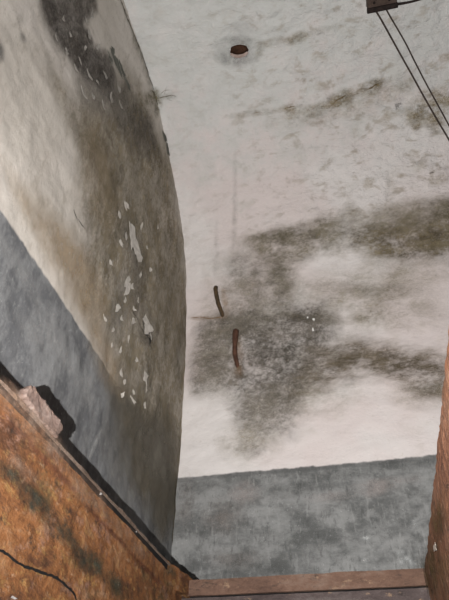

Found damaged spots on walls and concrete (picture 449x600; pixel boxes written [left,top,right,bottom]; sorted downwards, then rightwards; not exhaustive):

damp [43,0,187,510]
peeling [119,221,148,262]
damp [254,223,343,294]
damp [352,201,449,258]
peeling [115,276,134,321]
peeling [131,297,154,342]
damp [199,306,445,441]
crack [0,549,76,600]